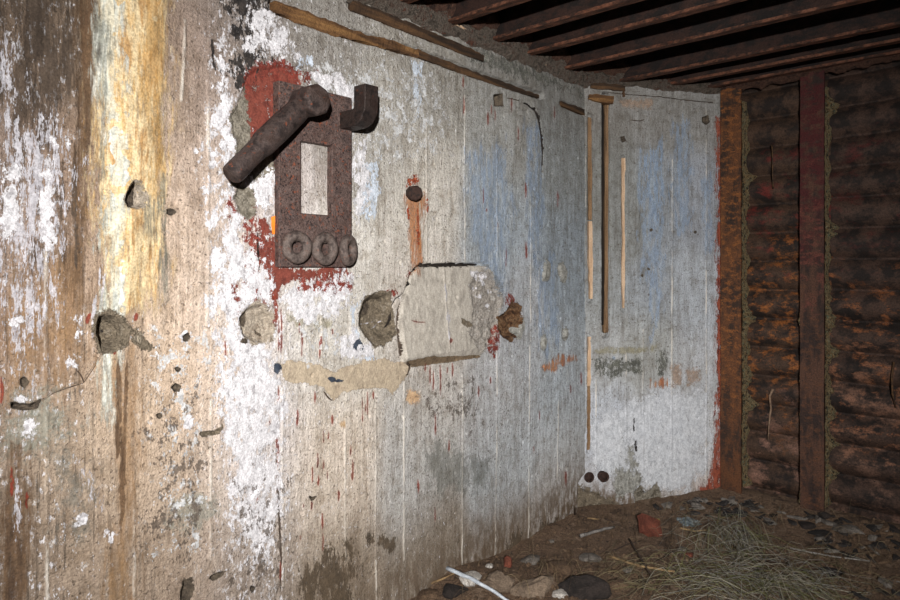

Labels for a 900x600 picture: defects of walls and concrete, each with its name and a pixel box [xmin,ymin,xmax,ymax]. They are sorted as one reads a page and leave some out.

crack [507,98,544,166]
damp [0,0,174,440]
spalling [123,179,151,210]
peeling [226,154,354,347]
corrosion [404,174,429,275]
crack [47,356,102,398]
spalling [85,307,154,355]
spalling [353,286,398,351]
spalling [468,266,525,361]
corrosion [700,116,721,491]
damp [97,348,128,543]